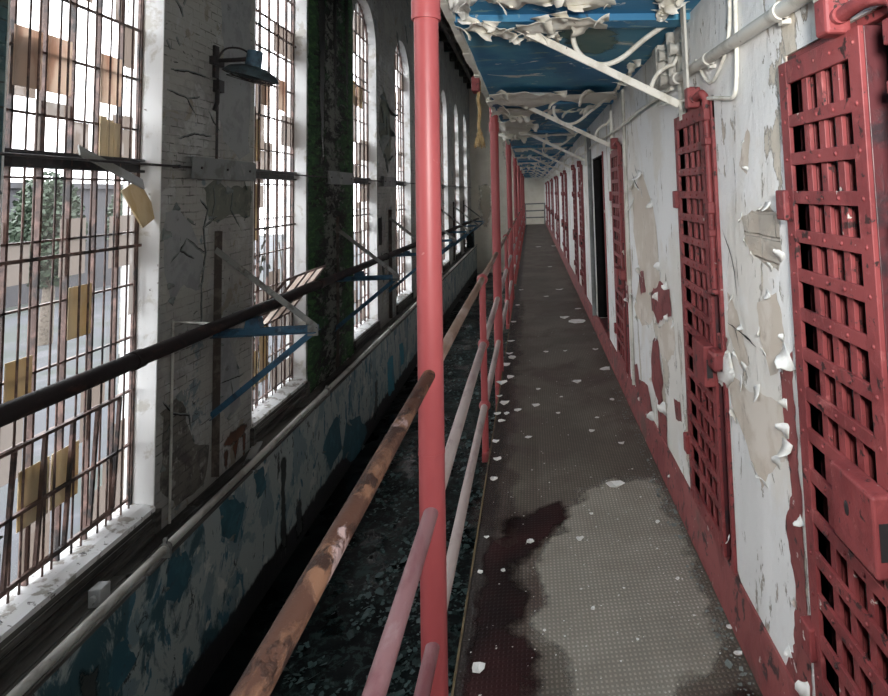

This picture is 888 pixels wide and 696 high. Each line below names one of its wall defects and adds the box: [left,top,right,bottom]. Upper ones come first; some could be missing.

peeling [448,0,616,46]
peeling [652,0,690,23]
peeling [486,59,644,175]
peeling [162,202,206,306]
peeling [622,170,671,328]
flaking render [738,201,785,272]
flaking render [160,390,209,510]
rust [224,424,247,468]
peeling [323,414,367,470]
peeling [634,336,682,447]
peeling [709,290,812,696]
damp [463,501,569,696]